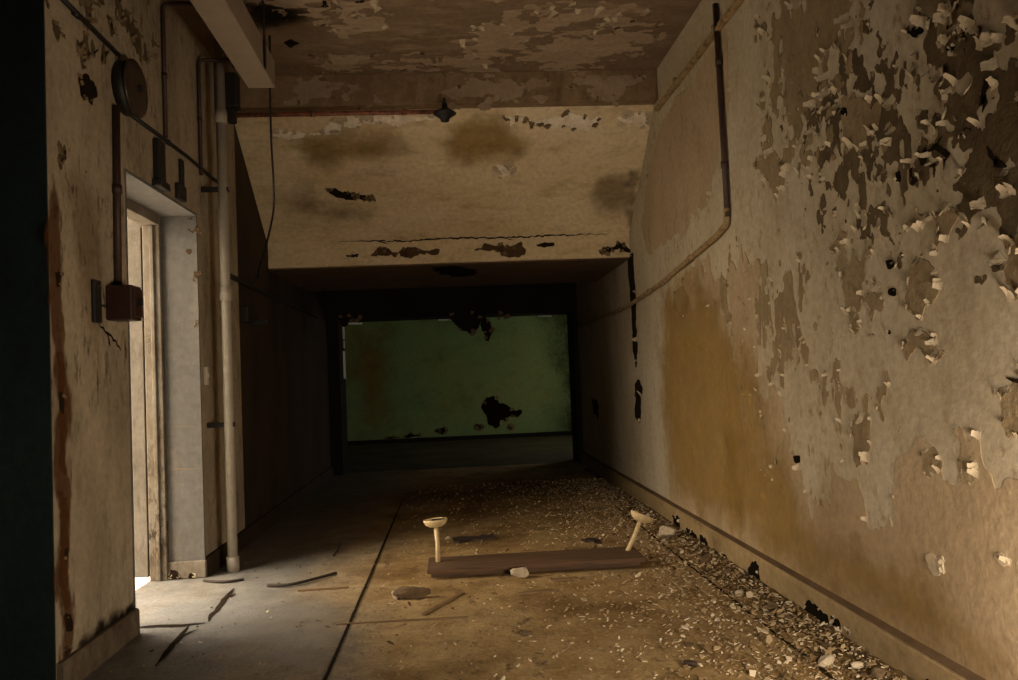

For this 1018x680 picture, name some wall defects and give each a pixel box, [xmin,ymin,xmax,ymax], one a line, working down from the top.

peeling [242,0,396,39]
water stain [450,125,520,164]
peeling [268,0,731,258]
peeling [752,0,1018,364]
spalling [598,240,638,367]
spalling [474,396,522,431]
spalling [634,379,643,423]
water stain [665,290,829,569]
peeling [660,236,1018,680]